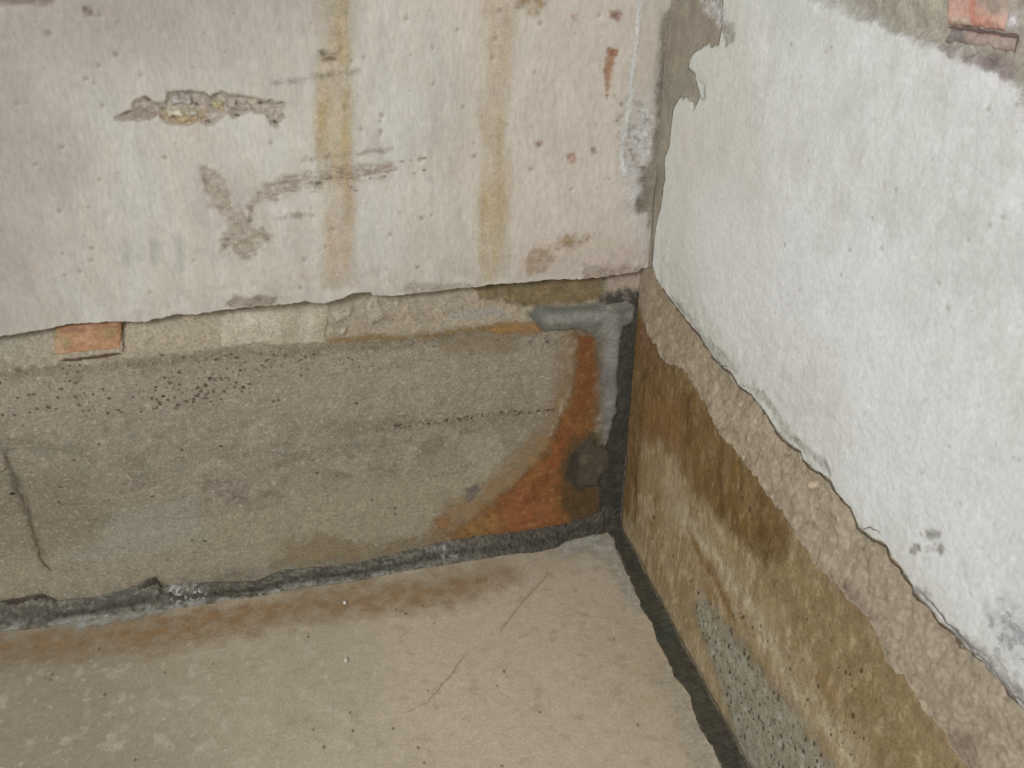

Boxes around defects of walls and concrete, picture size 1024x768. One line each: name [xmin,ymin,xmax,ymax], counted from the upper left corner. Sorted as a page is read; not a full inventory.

peeling [841,0,1024,96]
spalling [116,91,285,127]
peeling [636,0,735,270]
rust [488,322,540,335]
rust [431,333,600,542]
crack [0,454,51,571]
water stain [624,313,964,768]
rust [0,571,511,660]
spalling [696,591,824,768]